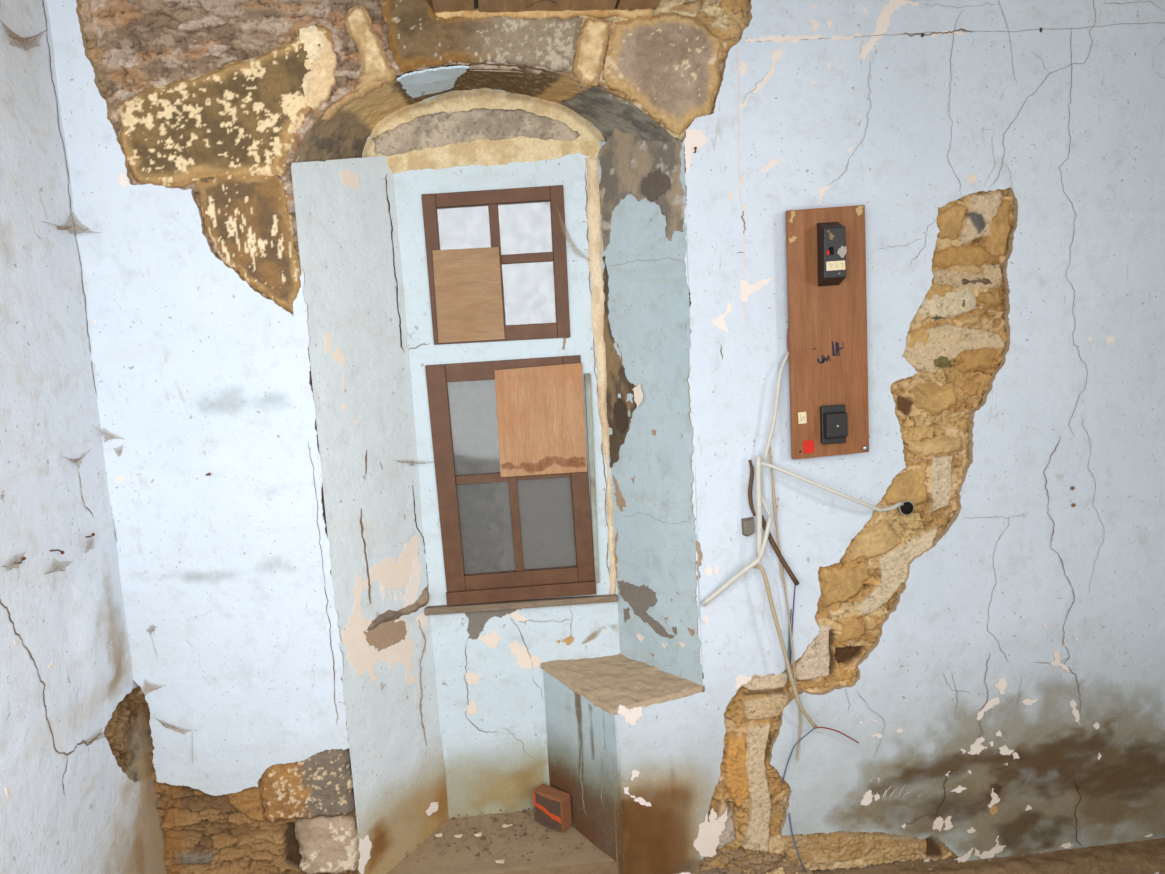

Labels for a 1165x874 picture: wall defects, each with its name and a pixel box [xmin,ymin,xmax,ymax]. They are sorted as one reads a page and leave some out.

crack [42,0,98,399]
spalling [79,0,751,512]
crack [743,0,1165,738]
crack [0,599,103,796]
spalling [103,686,372,874]
peeling [341,535,429,686]
peeling [426,802,439,816]
peeling [465,609,543,670]
peeling [624,769,652,807]
spalling [679,174,1019,874]
water stain [834,672,1165,856]
crack [1073,778,1082,845]